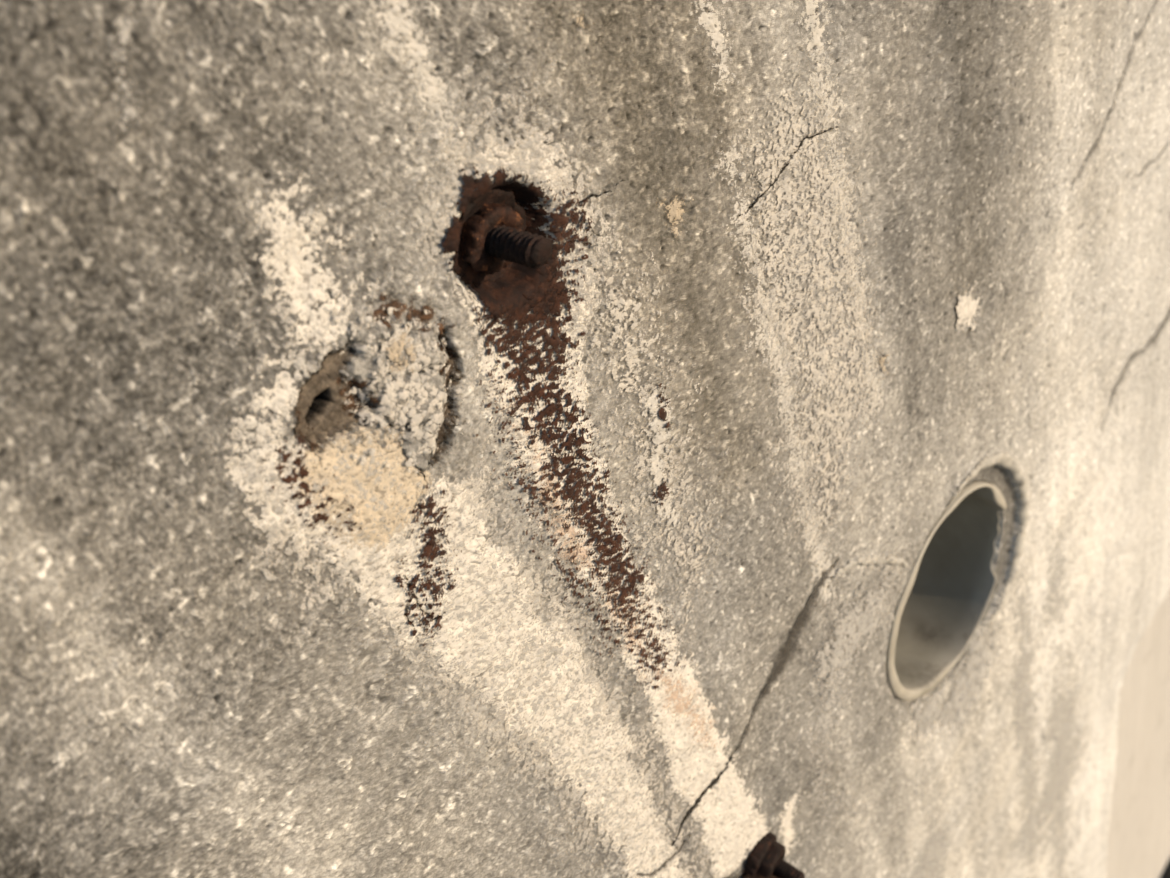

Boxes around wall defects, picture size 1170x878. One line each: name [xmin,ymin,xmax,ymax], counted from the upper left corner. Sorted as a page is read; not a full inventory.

crack [739,126,838,217]
spalling [259,293,469,543]
corrosion [442,166,692,695]
corrosion [395,485,462,646]
crack [636,555,908,876]